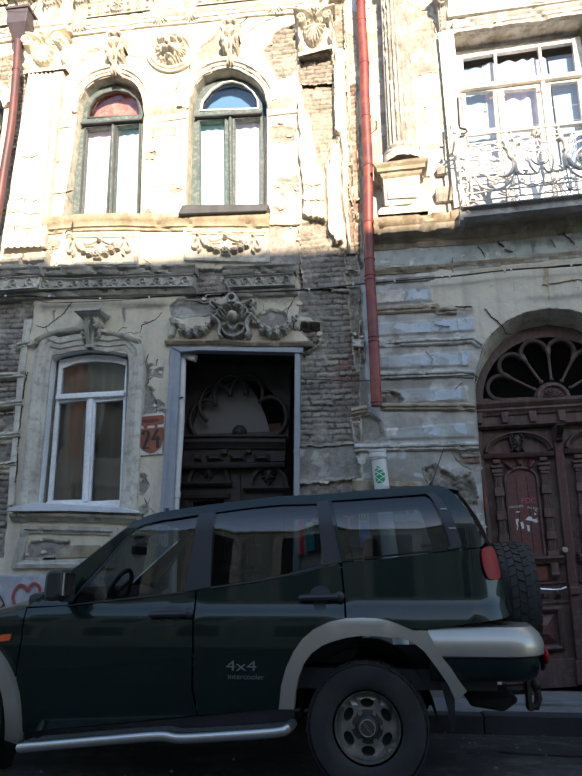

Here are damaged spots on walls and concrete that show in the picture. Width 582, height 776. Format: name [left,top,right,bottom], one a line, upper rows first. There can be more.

crack [238,15,285,35]
peeling [407,0,437,76]
peeling [416,100,445,163]
spalling [263,0,404,495]
spalling [0,300,34,432]
crack [118,312,162,386]
peeling [255,309,287,329]
crack [455,306,514,335]
spalling [0,442,12,462]
spalling [0,472,10,558]
spalling [423,451,487,528]